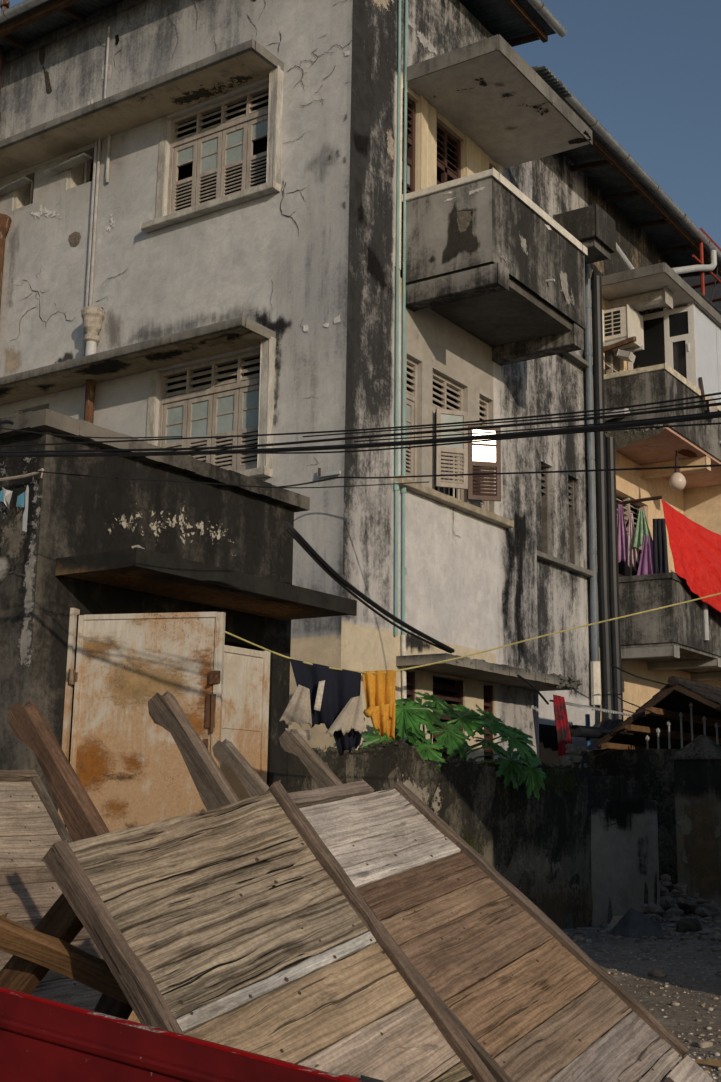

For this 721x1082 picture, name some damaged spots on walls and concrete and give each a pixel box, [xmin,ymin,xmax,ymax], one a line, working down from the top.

crack [247,0,352,106]
water stain [169,74,256,106]
water stain [354,133,370,154]
water stain [368,247,387,289]
crack [10,266,74,354]
water stain [502,512,529,665]
corrosion [83,640,117,658]
corrosion [110,663,185,703]
corrosion [186,650,213,735]
corrosion [76,741,141,788]
water stain [591,799,645,831]